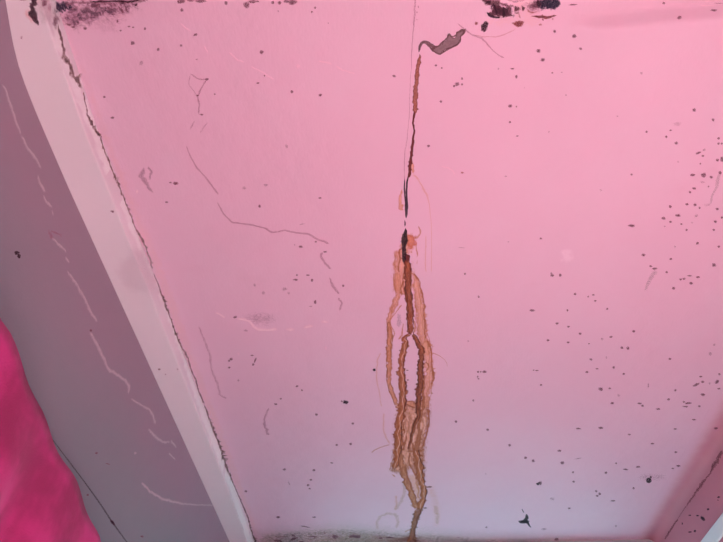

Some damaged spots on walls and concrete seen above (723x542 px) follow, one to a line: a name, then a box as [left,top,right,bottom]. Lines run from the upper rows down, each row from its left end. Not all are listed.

peeling [48,0,112,176]
crack [401,0,422,271]
peeling [418,29,467,55]
peeling [486,0,543,30]
crack [187,150,343,310]
peeling [158,292,254,542]
corrosion [372,161,447,542]